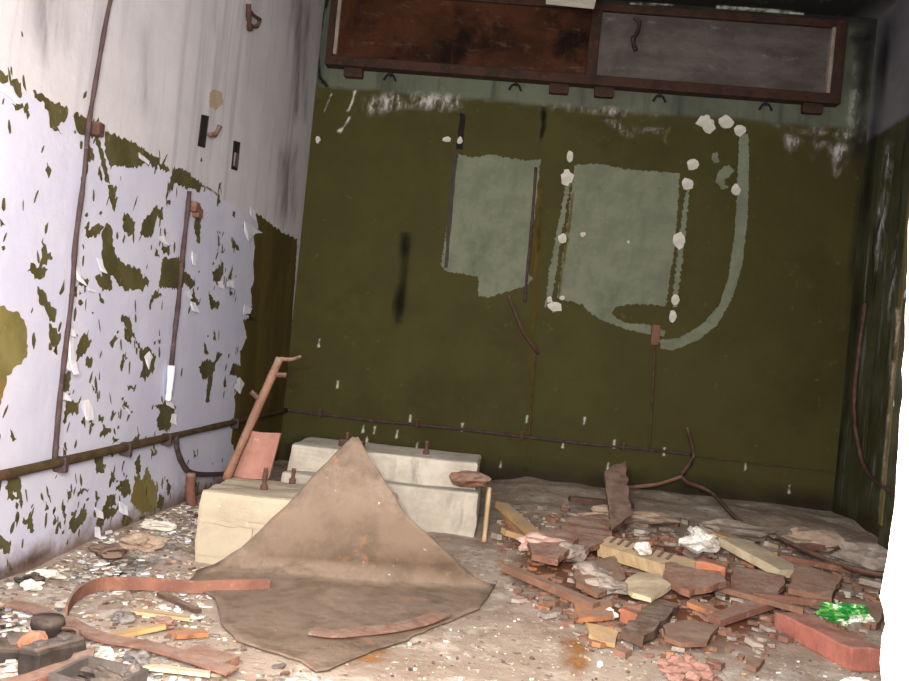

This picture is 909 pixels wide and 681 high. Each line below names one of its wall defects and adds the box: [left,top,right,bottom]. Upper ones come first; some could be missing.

leakage [420,95,449,107]
peeling [695,114,746,137]
peeling [561,151,574,186]
peeling [682,159,699,190]
peeling [711,152,734,189]
peeling [0,67,297,462]
peeling [547,296,565,311]
peeling [669,294,680,323]
peeling [887,362,895,424]
peeling [0,396,247,673]
peeling [151,656,198,681]
peeling [256,663,321,681]